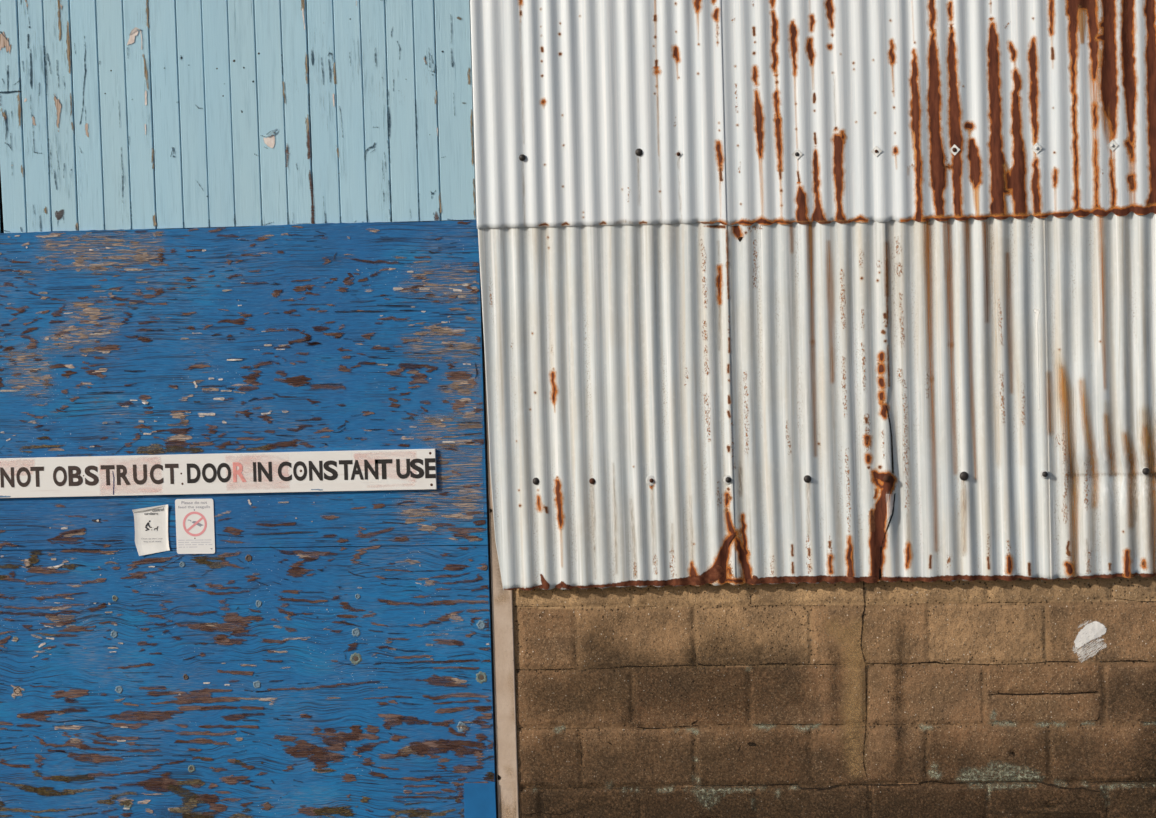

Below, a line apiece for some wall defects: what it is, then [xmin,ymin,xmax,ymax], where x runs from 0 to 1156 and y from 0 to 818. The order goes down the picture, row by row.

peeling [54,0,71,73]
peeling [127,0,149,105]
corrosion [694,0,868,375]
corrosion [900,0,1156,441]
peeling [0,54,494,818]
corrosion [504,241,1156,591]
crack [516,581,1156,818]